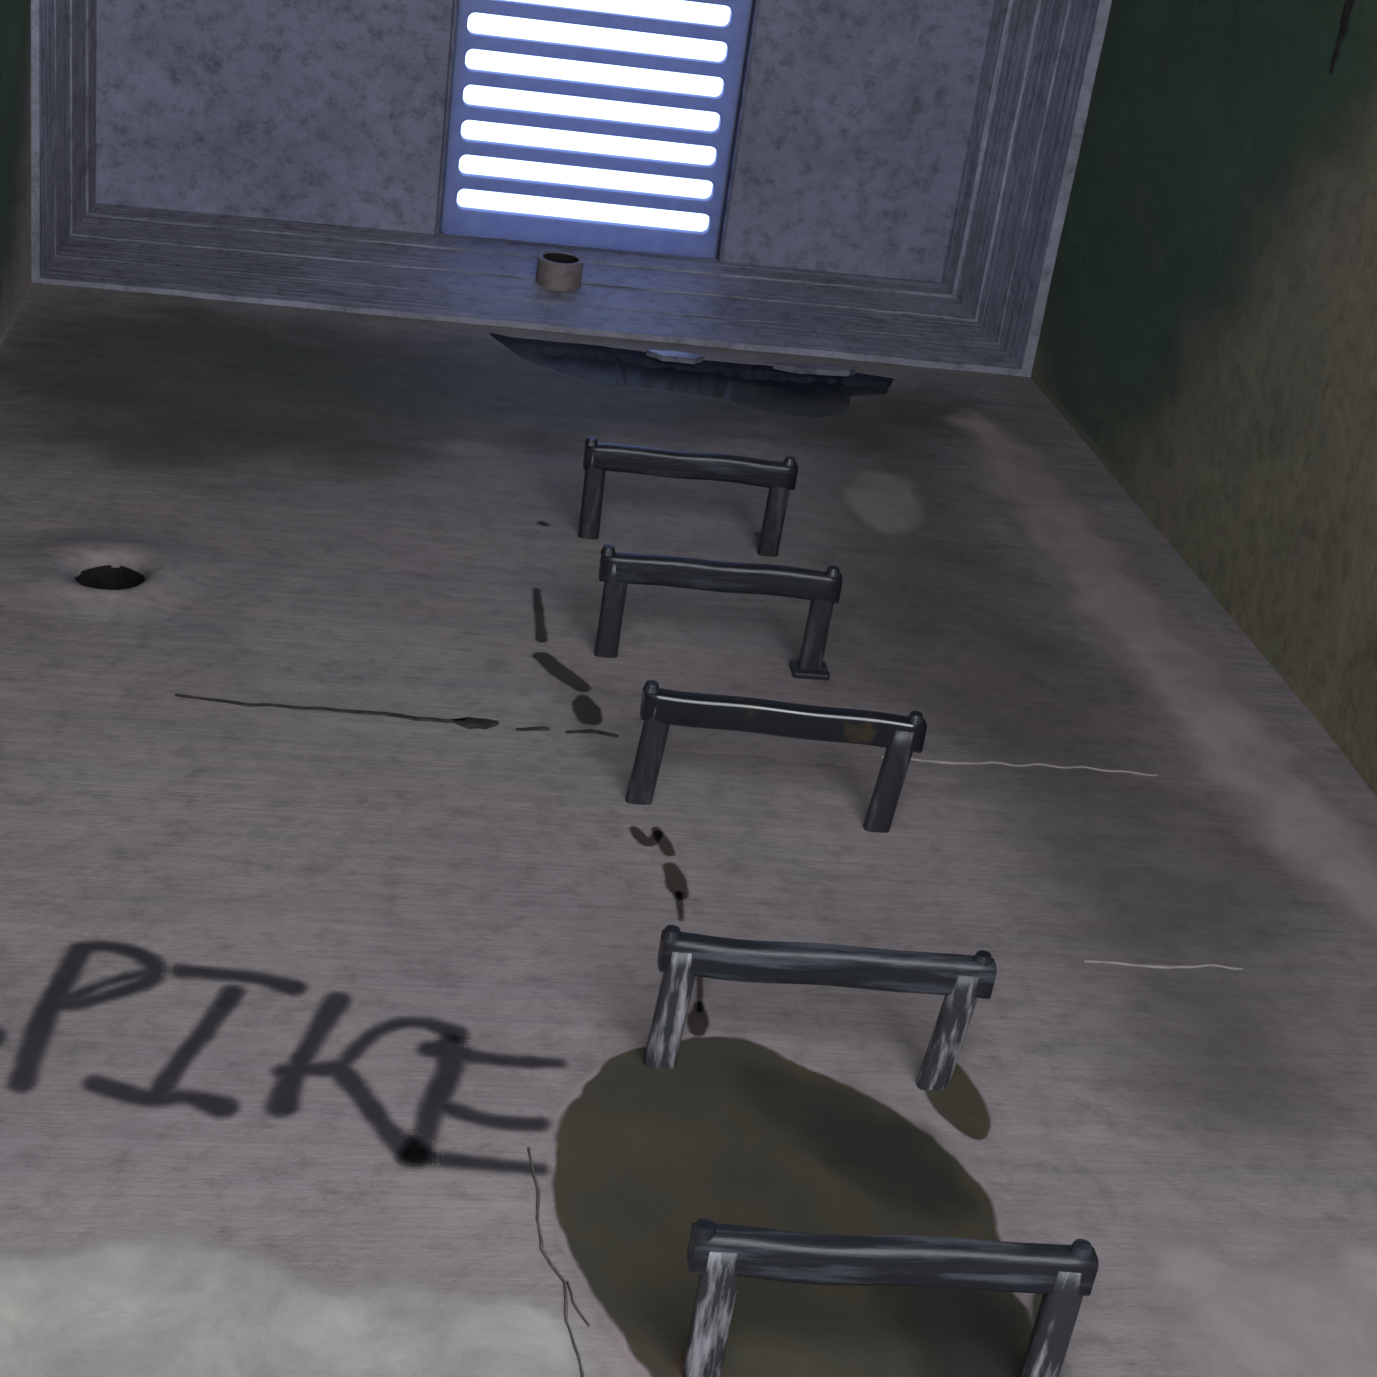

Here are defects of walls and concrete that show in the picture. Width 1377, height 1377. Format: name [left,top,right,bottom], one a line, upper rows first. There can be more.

spalling [488,332,894,418]
crack [175,694,619,738]
leakage [550,977,1033,1377]